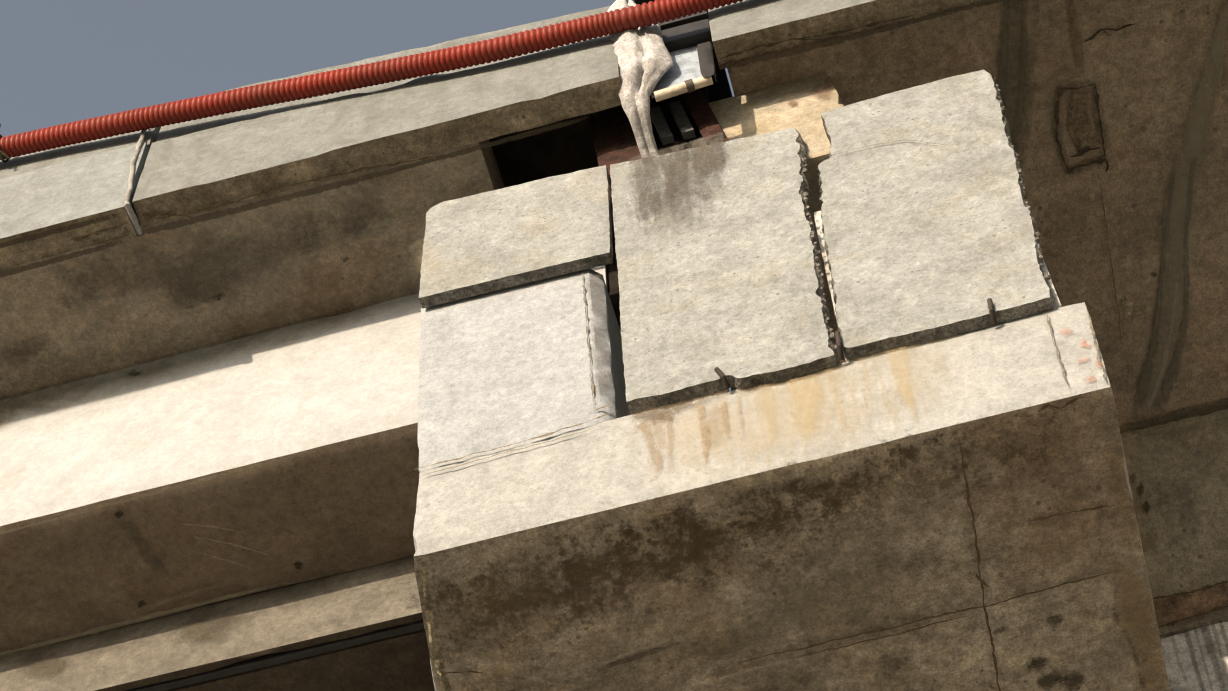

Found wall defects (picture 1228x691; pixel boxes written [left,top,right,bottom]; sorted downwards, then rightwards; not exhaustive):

leakage [998,0,1028,153]
crack [1084,24,1134,42]
leakage [635,133,725,212]
leakage [1136,0,1228,413]
crack [729,441,1129,691]
leakage [1027,657,1083,691]